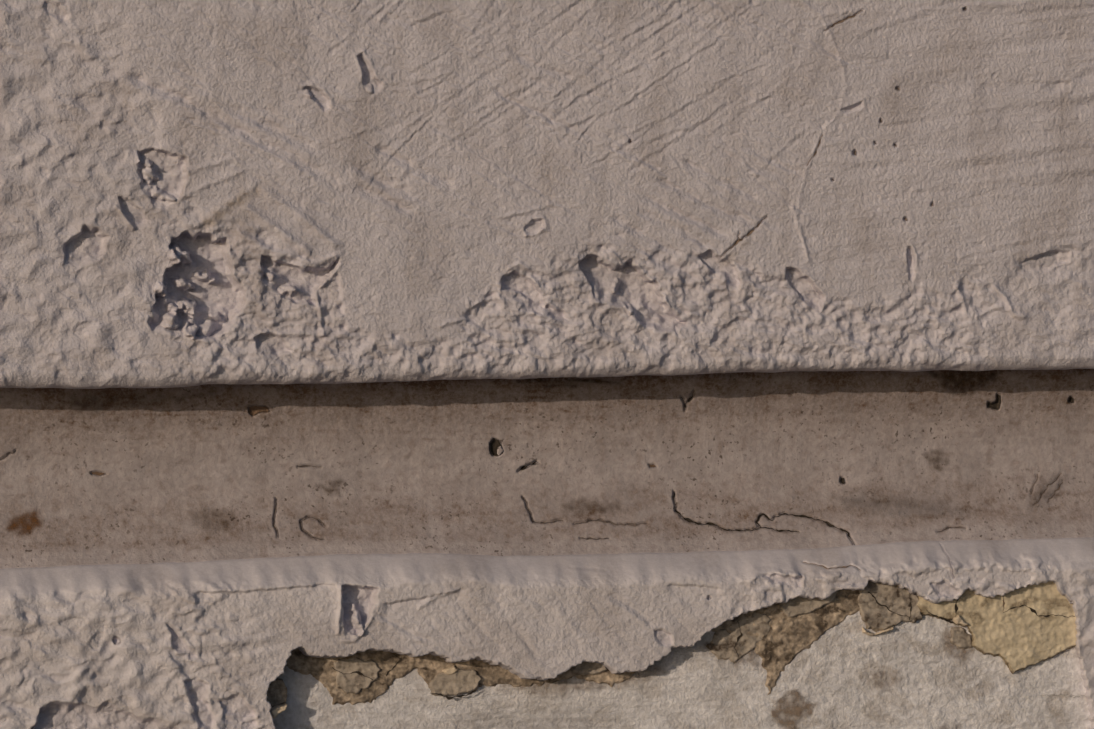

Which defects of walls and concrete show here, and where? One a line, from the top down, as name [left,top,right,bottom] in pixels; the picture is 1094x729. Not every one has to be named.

crack [523,497,648,540]
crack [673,491,860,570]
spalling [167,624,197,659]
peeling [267,581,1091,729]
spalling [33,701,175,729]
spalling [185,678,257,729]